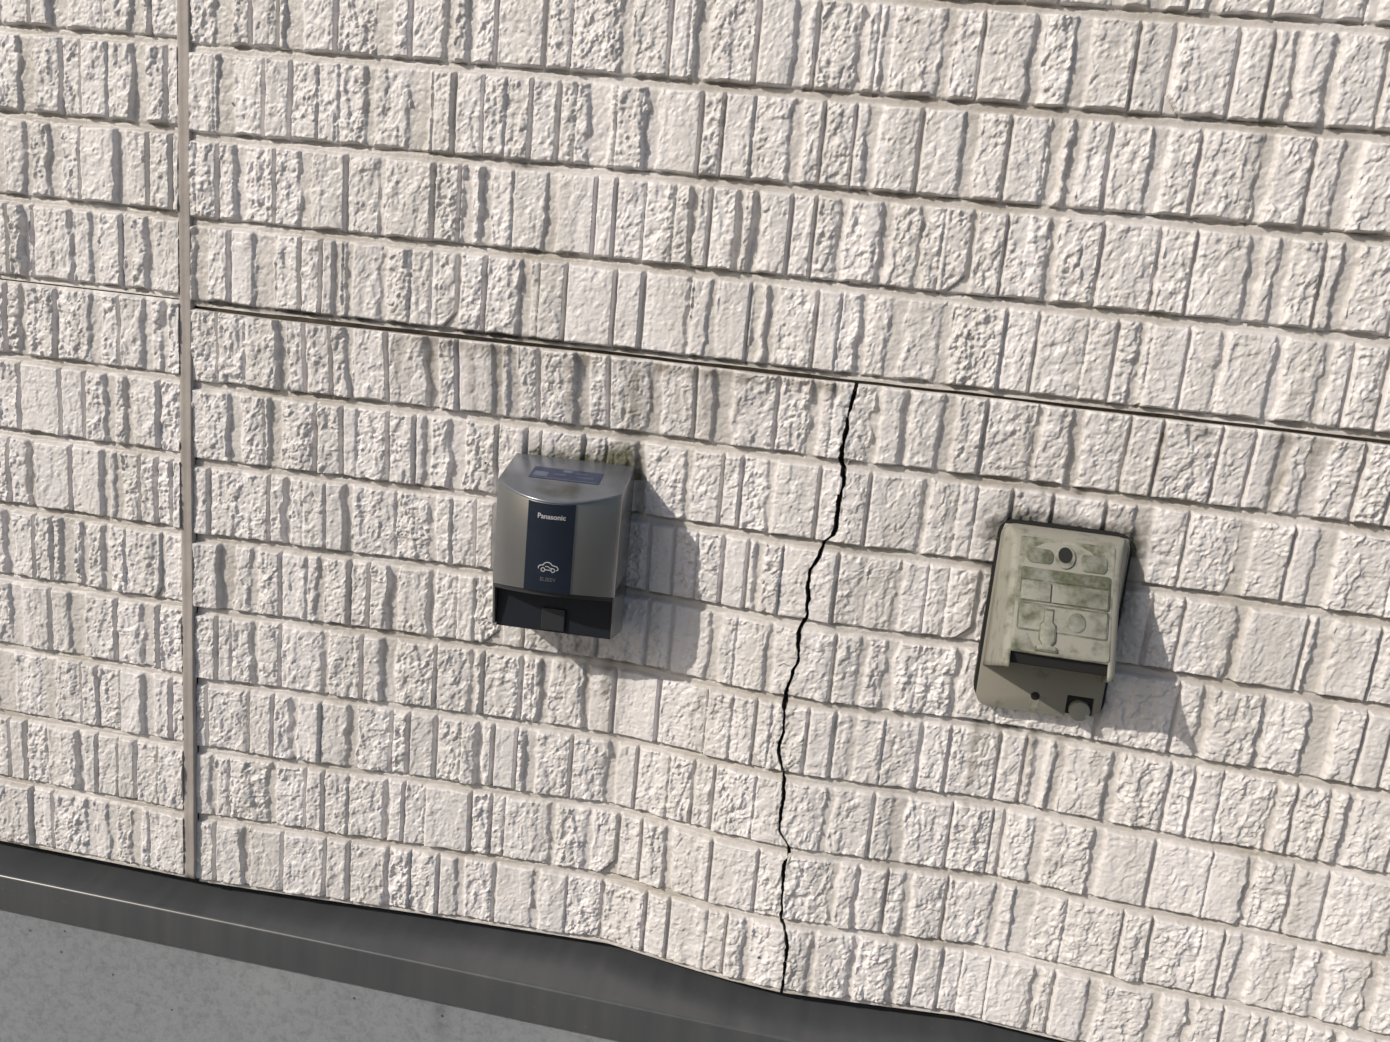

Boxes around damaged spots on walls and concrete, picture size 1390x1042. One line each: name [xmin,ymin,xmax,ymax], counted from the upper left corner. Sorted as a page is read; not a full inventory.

crack [776,382,859,990]